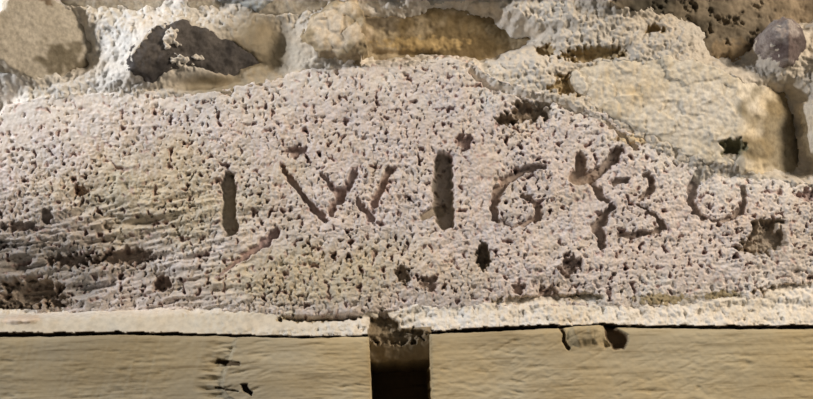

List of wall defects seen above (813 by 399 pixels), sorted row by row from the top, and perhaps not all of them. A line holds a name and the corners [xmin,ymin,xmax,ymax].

crack [0,330,368,339]
crack [432,322,813,351]
crack [216,359,241,367]